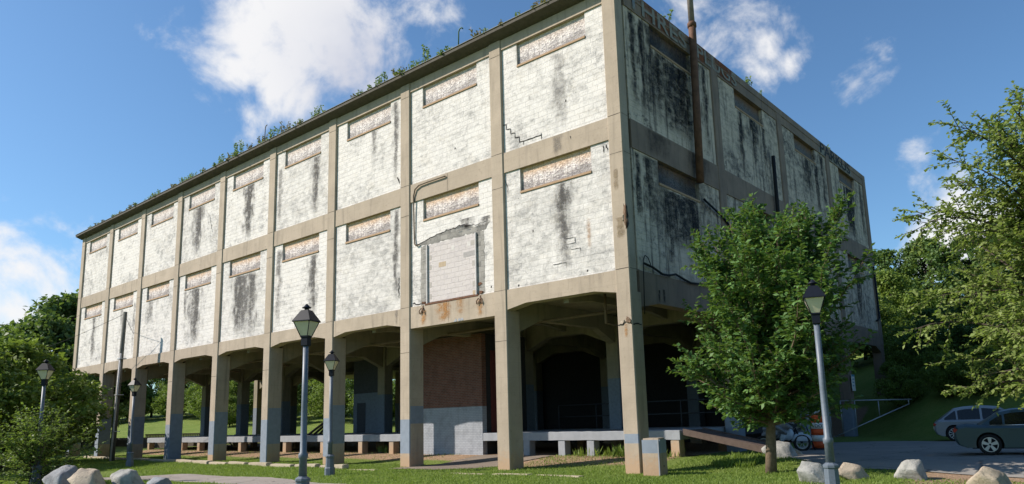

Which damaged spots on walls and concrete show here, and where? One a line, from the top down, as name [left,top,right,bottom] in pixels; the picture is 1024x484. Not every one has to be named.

damp [628,12,709,136]
crack [503,124,542,145]
damp [739,113,765,165]
damp [557,184,566,238]
damp [635,153,704,259]
damp [804,157,826,208]
damp [843,186,864,230]
peeling [419,221,492,314]
damp [184,289,199,327]
damp [233,274,255,324]